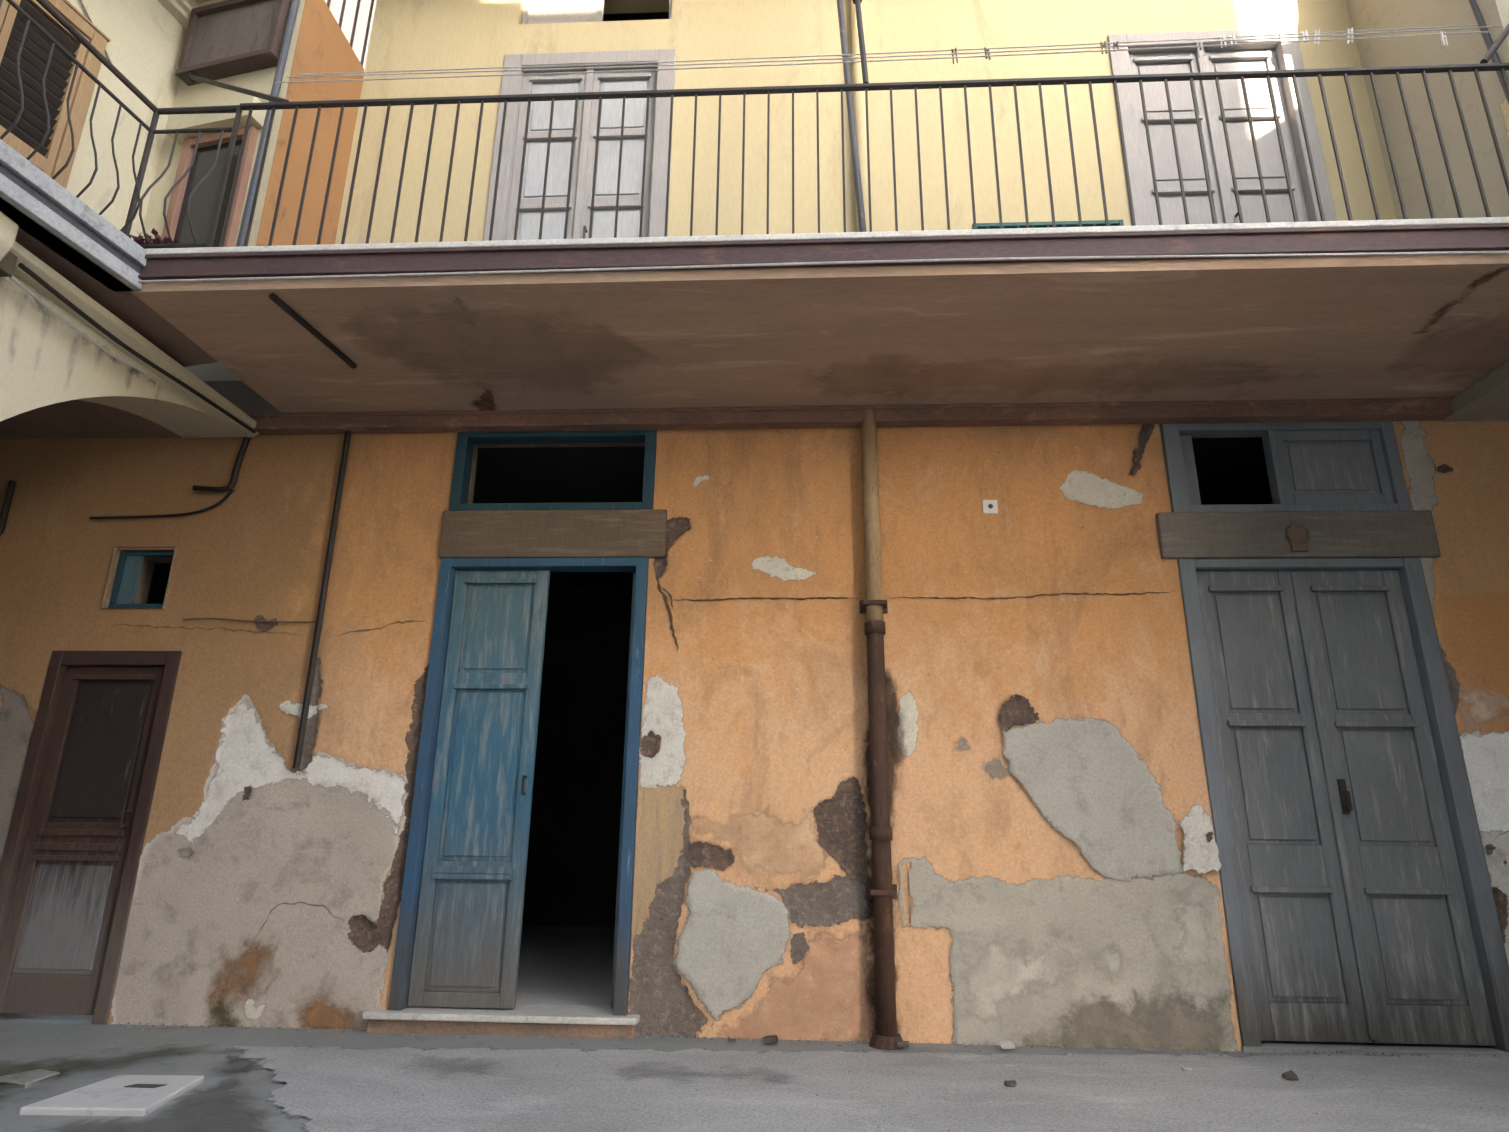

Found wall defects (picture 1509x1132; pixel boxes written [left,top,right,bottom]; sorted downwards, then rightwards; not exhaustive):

peeling [1060,424,1155,509]
peeling [751,555,816,581]
crack [112,620,426,636]
crack [655,575,1179,651]
spalling [1440,648,1460,714]
peeling [0,684,35,865]
spalling [640,730,661,758]
peeling [899,692,919,757]
peeling [111,657,429,1030]
peeling [1459,729,1509,965]
peeling [628,776,875,1043]
rust [209,943,272,1005]